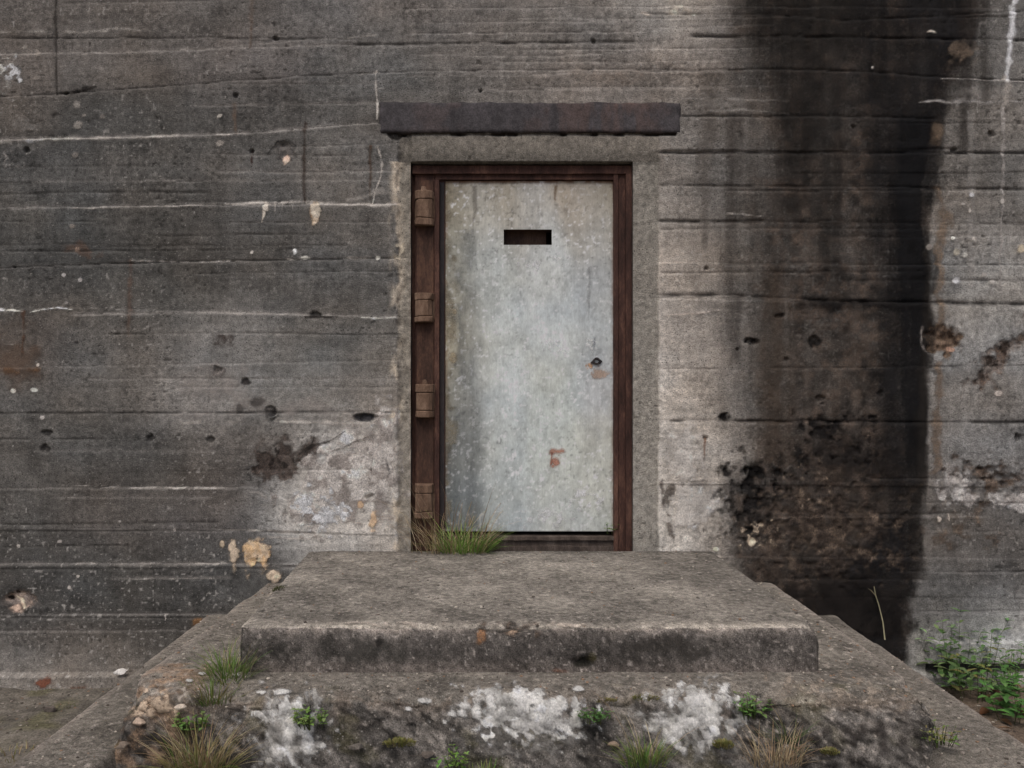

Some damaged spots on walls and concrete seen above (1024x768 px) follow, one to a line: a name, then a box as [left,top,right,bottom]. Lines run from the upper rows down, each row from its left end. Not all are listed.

damp [713,0,986,661]
spalling [921,323,964,358]
spalling [973,334,1024,396]
peeling [251,394,410,542]
peeling [220,538,281,583]